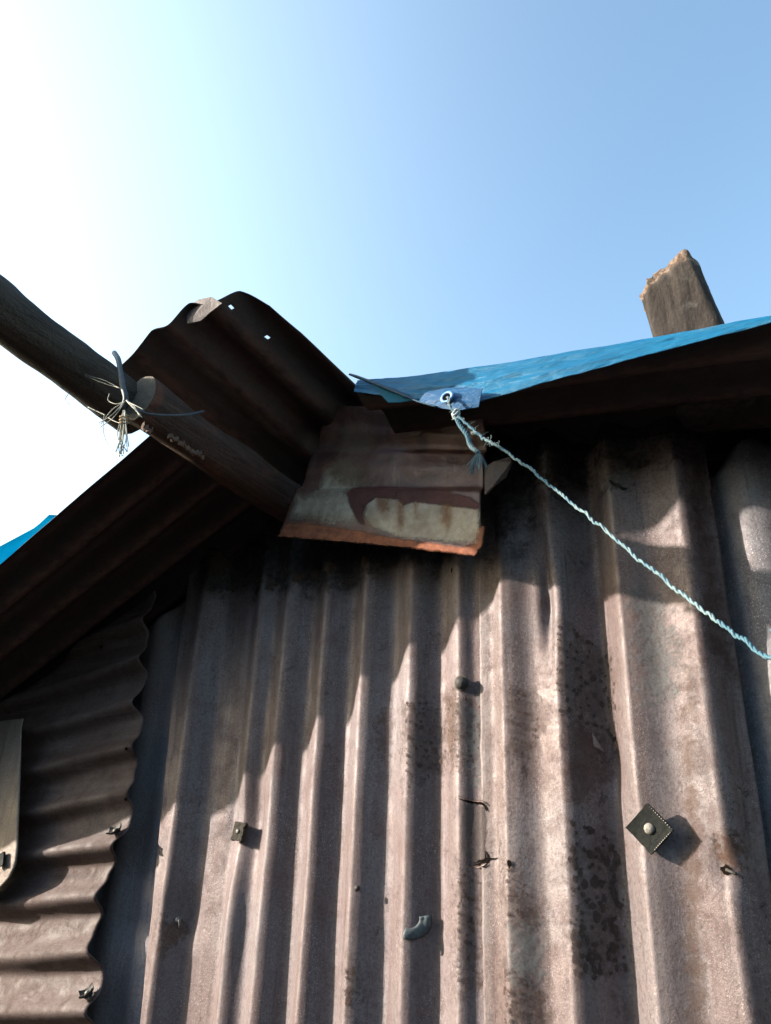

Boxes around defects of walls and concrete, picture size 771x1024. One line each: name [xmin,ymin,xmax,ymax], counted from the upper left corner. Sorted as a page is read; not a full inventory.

rust [278,487,484,555]
rust [567,820,627,980]